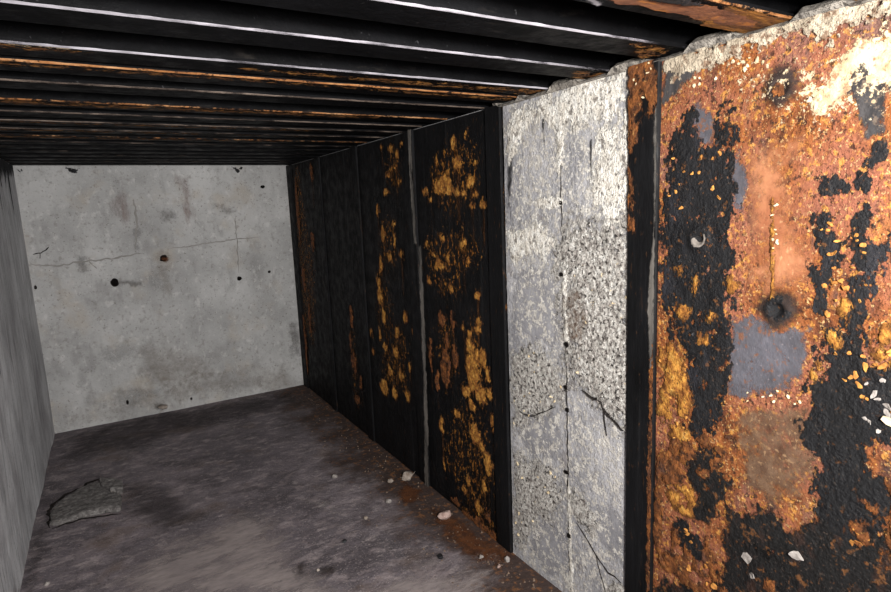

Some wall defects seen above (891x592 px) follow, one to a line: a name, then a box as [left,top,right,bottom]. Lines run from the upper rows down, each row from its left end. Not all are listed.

water stain [662,0,891,139]
corrosion [369,140,413,403]
corrosion [421,129,509,562]
corrosion [675,301,693,322]
corrosion [673,264,698,297]
corrosion [696,310,718,347]
corrosion [751,143,810,299]
corrosion [821,278,855,351]
corrosion [868,323,891,370]
crack [520,269,626,592]
corrosion [645,340,738,592]
corrosion [843,498,891,571]